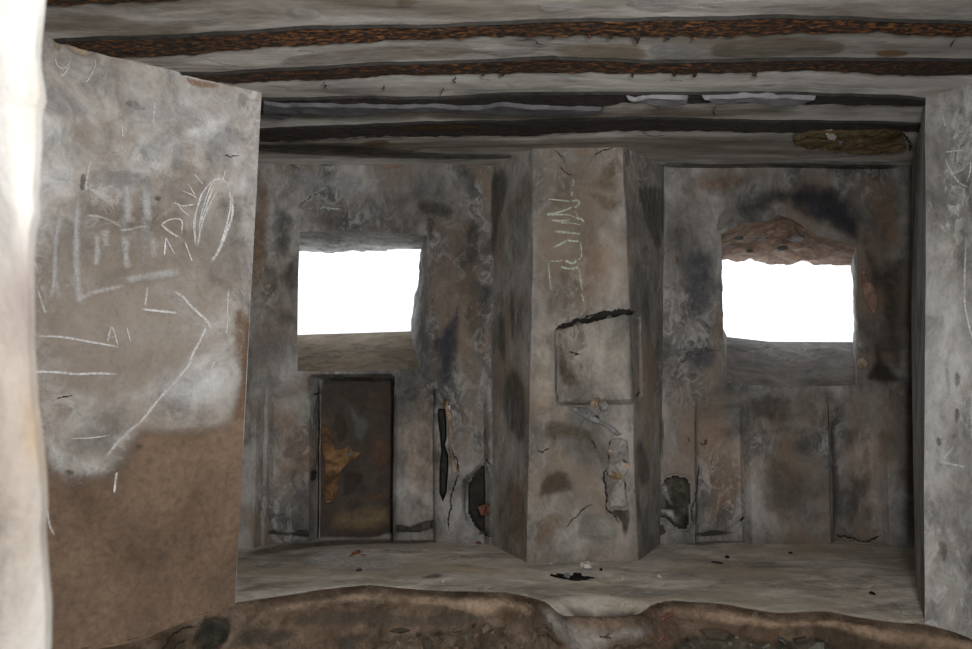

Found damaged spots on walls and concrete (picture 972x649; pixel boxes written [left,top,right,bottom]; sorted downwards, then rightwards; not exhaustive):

crack [556,308,633,329]
corrosion [320,378,394,537]
spalling [438,398,457,501]
spalling [465,455,492,540]
spalling [570,398,630,532]
spalling [659,473,726,536]